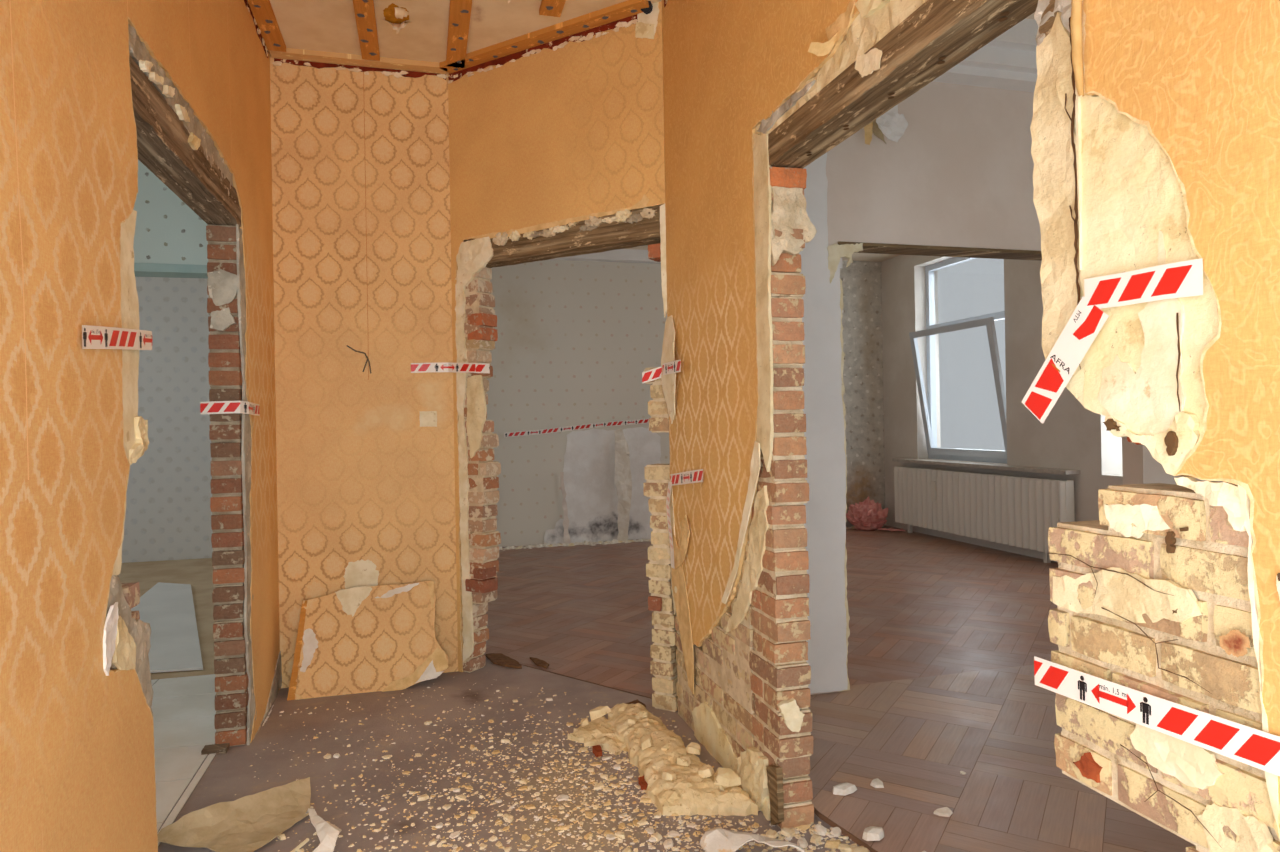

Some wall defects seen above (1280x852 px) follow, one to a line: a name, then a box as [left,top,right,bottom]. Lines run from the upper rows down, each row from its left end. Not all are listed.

peeling [381,3,412,34]
spalling [635,1,659,39]
spalling [755,0,927,135]
flaking render [864,104,908,145]
flaking render [648,243,661,262]
flaking render [1048,0,1268,733]
spalling [103,575,153,716]
peeling [343,559,379,589]
spalling [675,486,784,826]
crack [1048,553,1212,694]
flaking render [1054,693,1280,852]
crack [1120,744,1222,848]